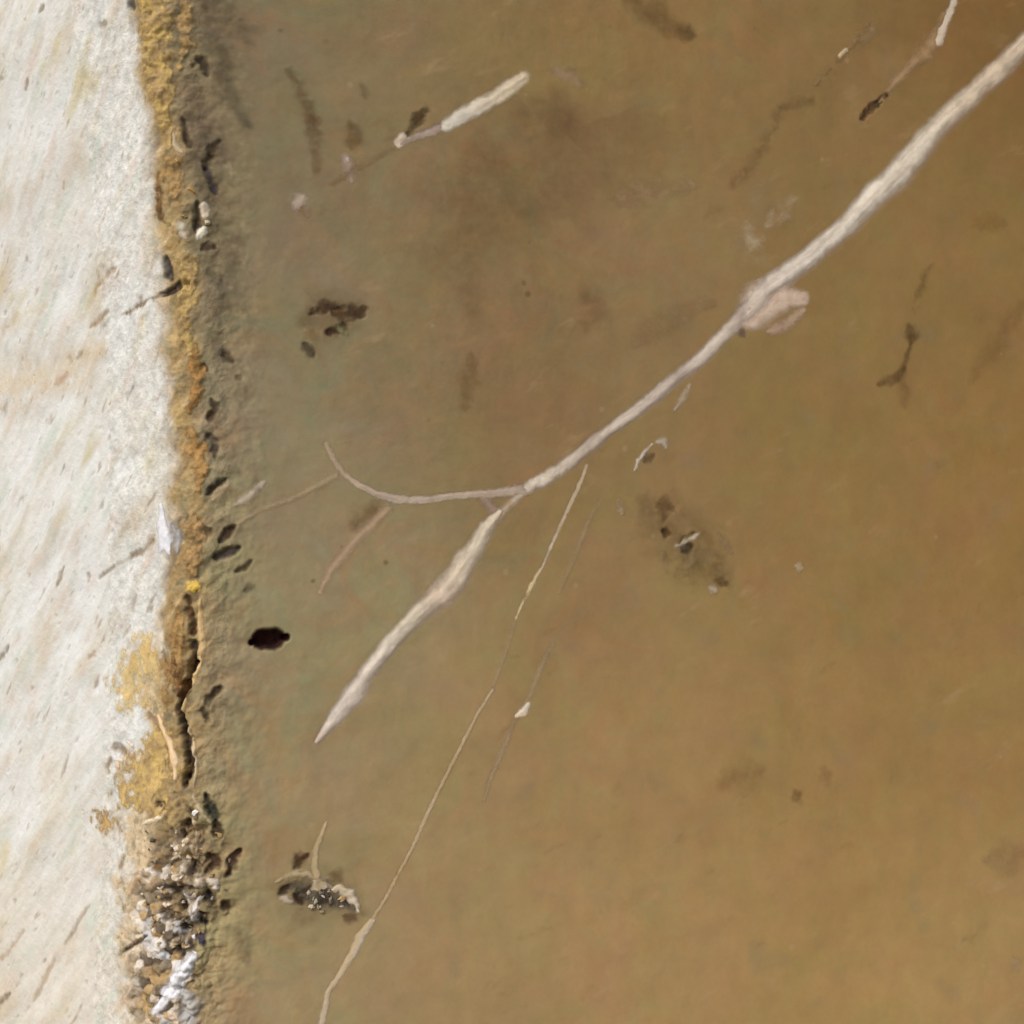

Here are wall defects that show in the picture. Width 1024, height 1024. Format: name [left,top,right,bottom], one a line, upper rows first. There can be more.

crack [838,23,875,60]
crack [860,0,957,120]
crack [235,33,1024,744]
crack [150,595,221,788]
crack [483,644,552,800]
spalling [125,794,242,1024]
spalling [275,821,360,921]
crack [319,689,494,1024]